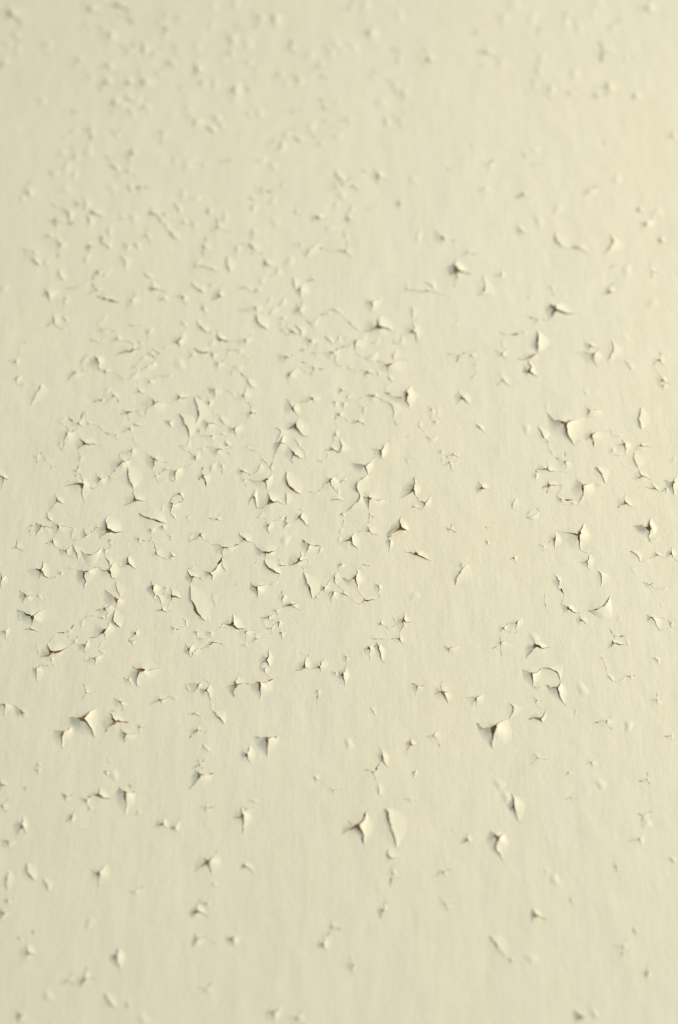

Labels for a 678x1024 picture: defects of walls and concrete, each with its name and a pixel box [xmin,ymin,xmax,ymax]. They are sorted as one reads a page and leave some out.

peeling [546,405,606,447]
peeling [35,376,256,557]
peeling [146,467,309,613]
peeling [548,523,595,569]
peeling [17,561,50,634]
peeling [32,555,136,682]
peeling [129,659,162,688]
peeling [227,649,274,699]
peeling [522,640,568,705]
peeling [53,697,139,749]
peeling [240,731,280,764]
peeling [476,717,512,749]